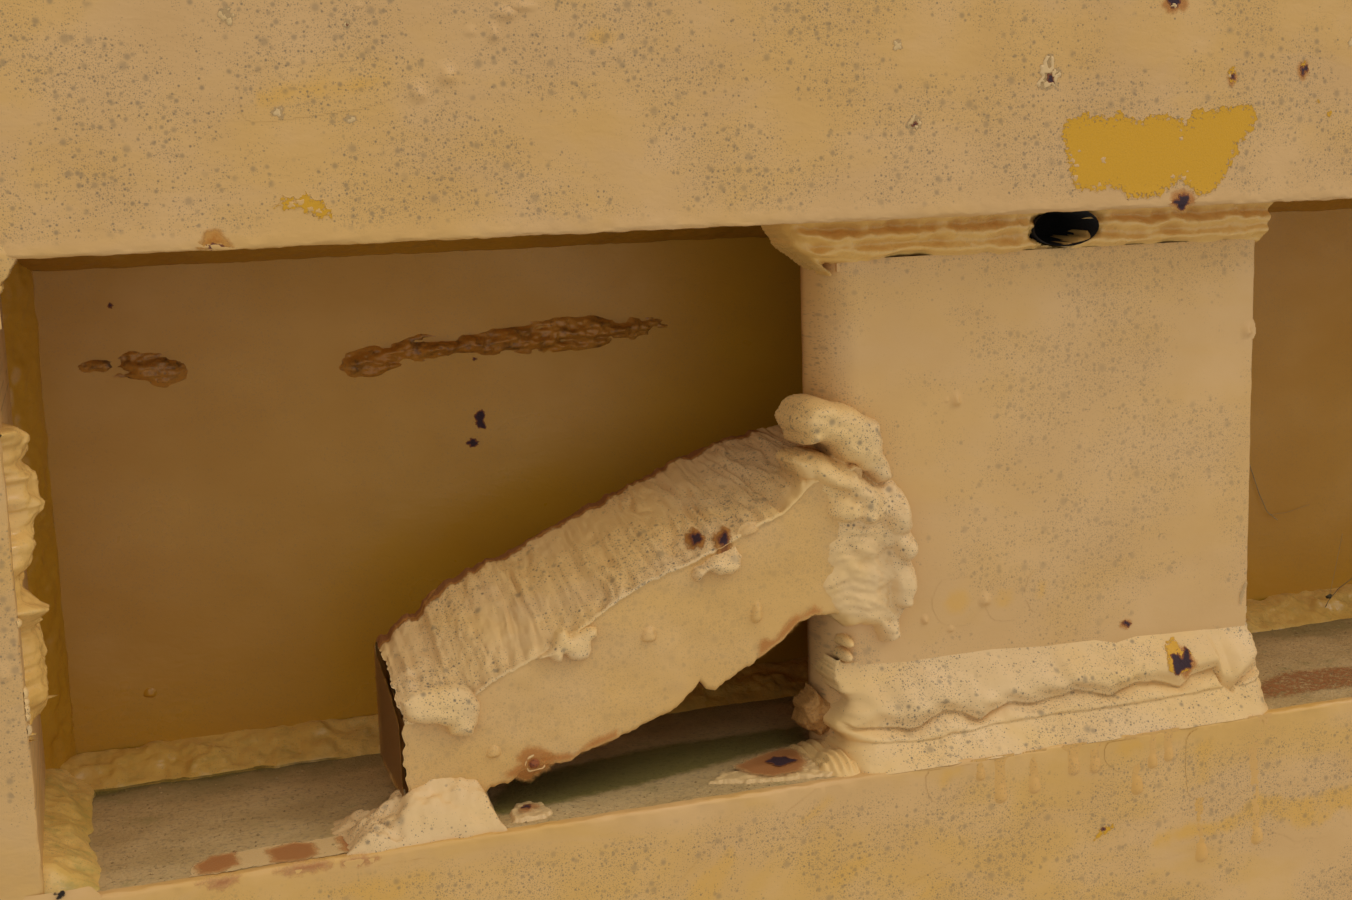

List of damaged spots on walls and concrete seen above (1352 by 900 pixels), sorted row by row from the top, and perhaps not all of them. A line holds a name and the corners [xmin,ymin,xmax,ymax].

corrosion [1163,0,1187,12]
peeling [1060,102,1258,201]
corrosion [1170,190,1194,211]
corrosion [374,430,761,797]
corrosion [1165,637,1195,676]
peeling [708,748,833,784]